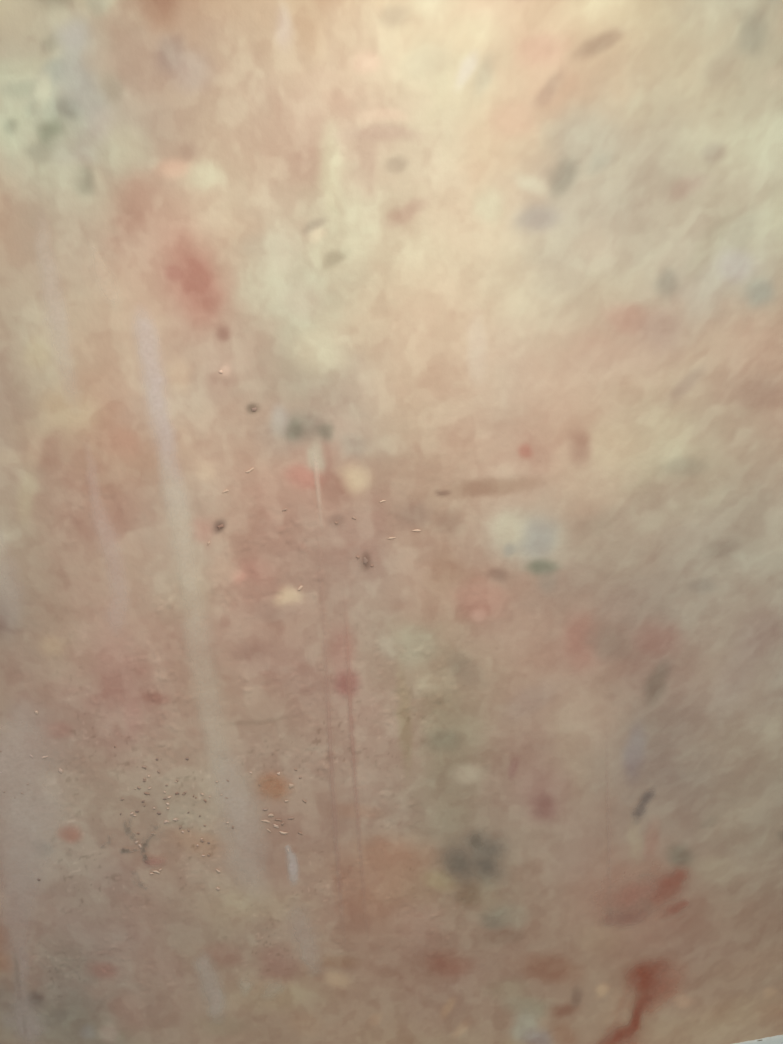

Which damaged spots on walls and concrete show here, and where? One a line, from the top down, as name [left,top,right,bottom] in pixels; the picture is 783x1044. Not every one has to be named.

leakage [120,758,302,885]
rust [601,961,677,1044]